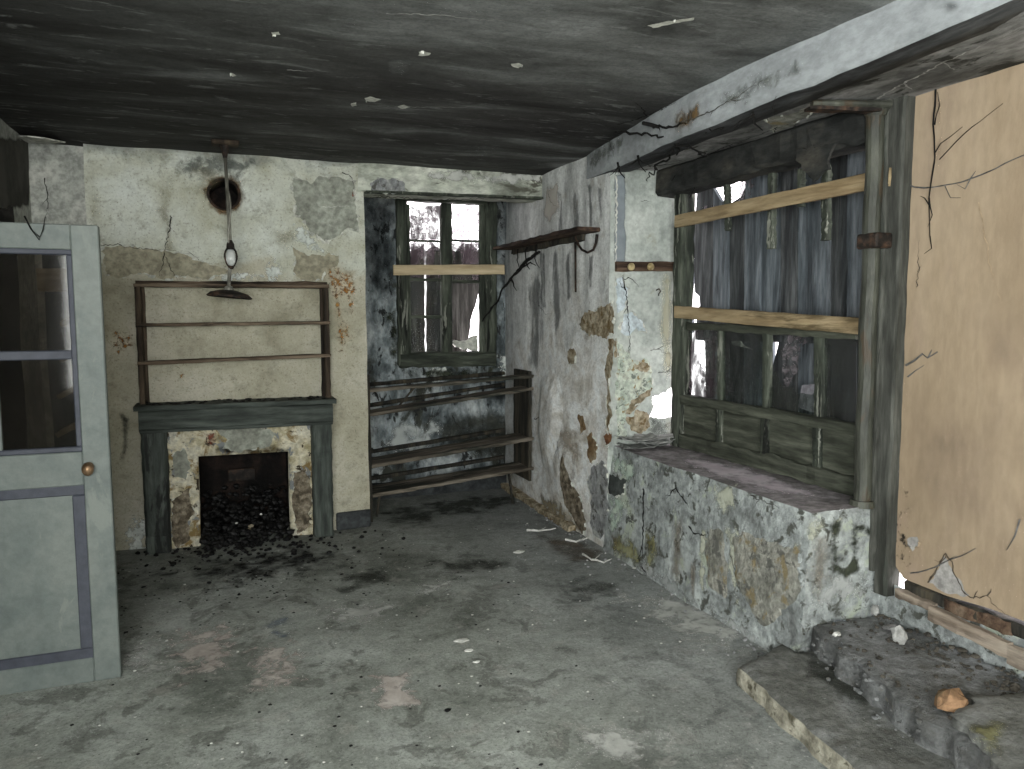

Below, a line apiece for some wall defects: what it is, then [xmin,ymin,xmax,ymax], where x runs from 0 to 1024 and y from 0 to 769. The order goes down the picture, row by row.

crack [609,74,819,156]
crack [102,215,199,278]
peeling [100,244,228,281]
peeling [289,174,360,282]
damp [365,202,394,283]
rust [328,270,355,351]
peeling [217,428,276,453]
damp [388,412,506,457]
peeling [560,274,653,539]
damp [687,460,808,512]
damp [817,575,874,605]
crack [927,553,1009,616]